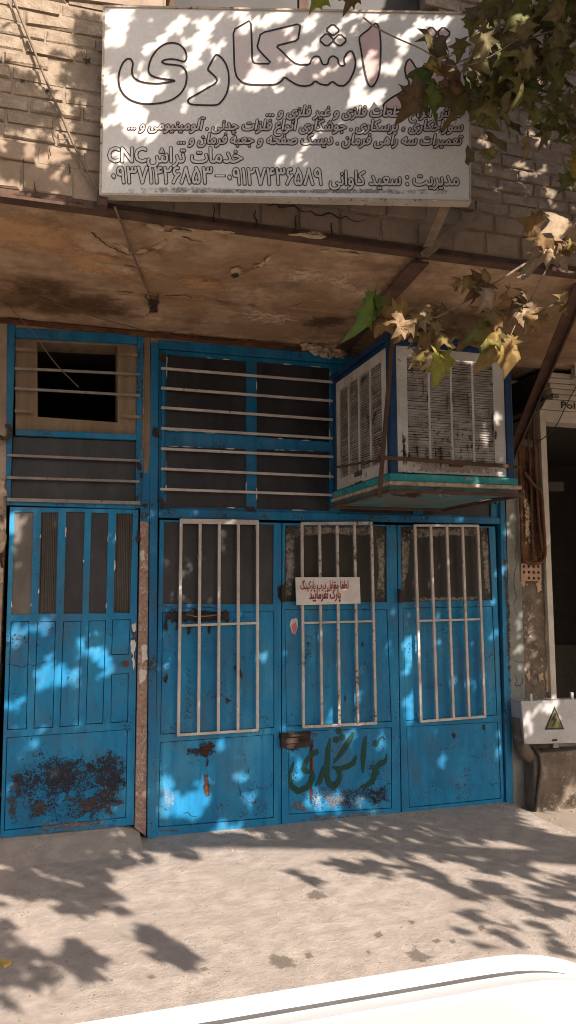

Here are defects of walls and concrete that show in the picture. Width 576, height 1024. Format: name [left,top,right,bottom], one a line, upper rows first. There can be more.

crack [91,232,167,255]
spalling [300,342,347,367]
rust [402,434,497,474]
peeling [130,623,148,684]
peeling [521,581,549,692]
rust [187,742,216,796]